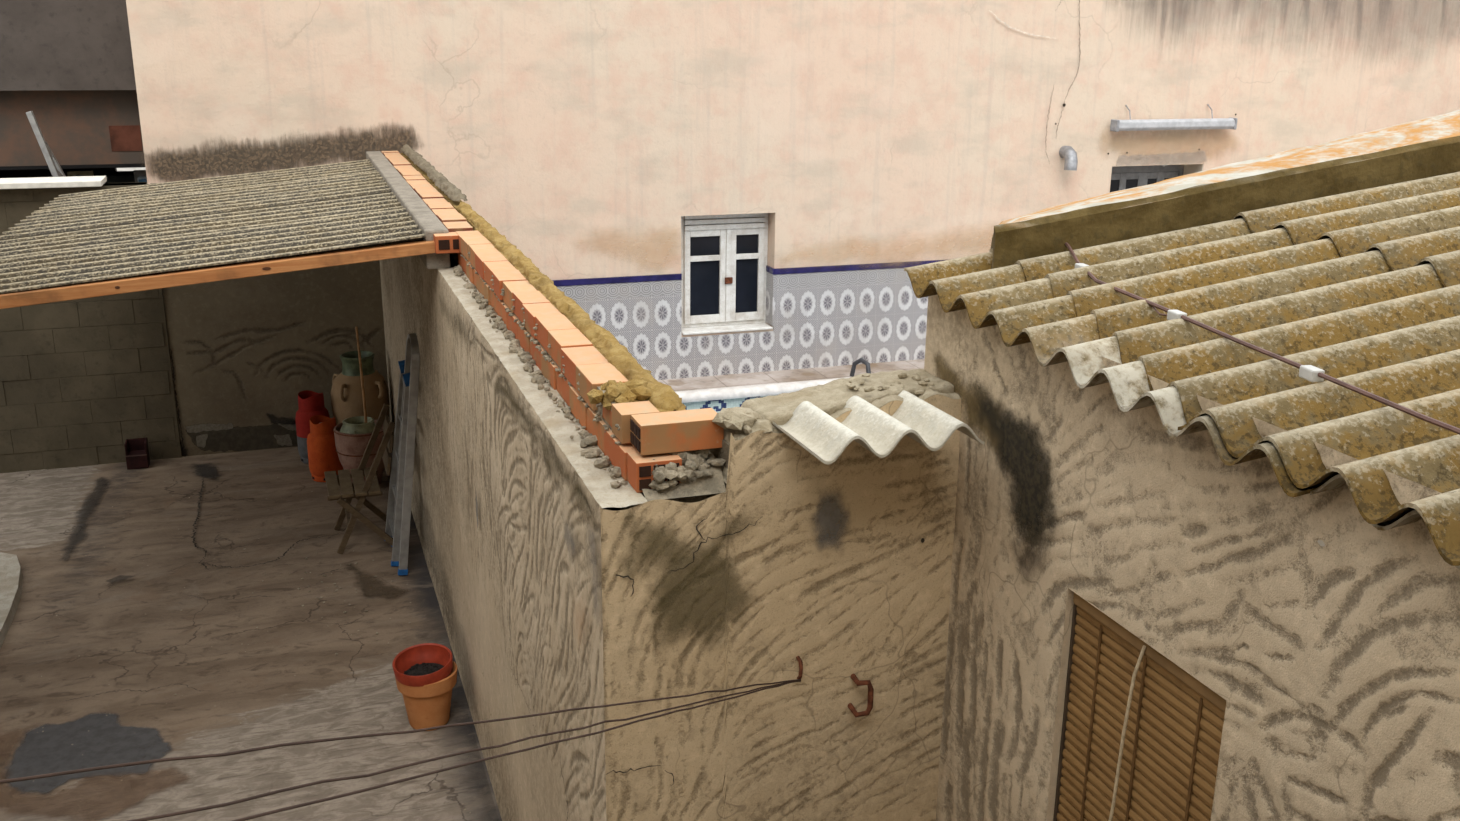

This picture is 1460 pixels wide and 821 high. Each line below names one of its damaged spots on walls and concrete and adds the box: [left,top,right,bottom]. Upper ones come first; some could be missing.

mould [148,127,417,182]
crack [170,349,347,575]
mould [979,394,1055,544]
water stain [641,529,746,638]